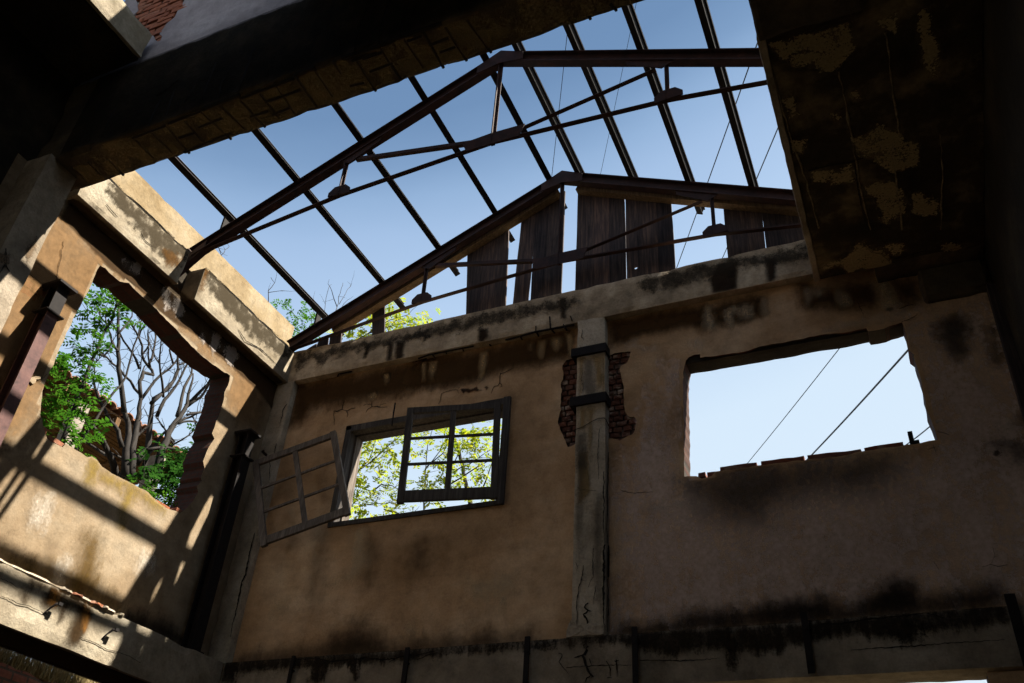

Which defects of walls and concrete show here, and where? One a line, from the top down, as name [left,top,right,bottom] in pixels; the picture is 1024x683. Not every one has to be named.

spalling [71,0,633,184]
water stain [766,261,775,282]
water stain [289,328,573,425]
flaking render [559,361,577,447]
flaking render [608,353,637,441]
crack [231,533,255,633]
water stain [221,580,1009,683]
crack [559,429,716,683]